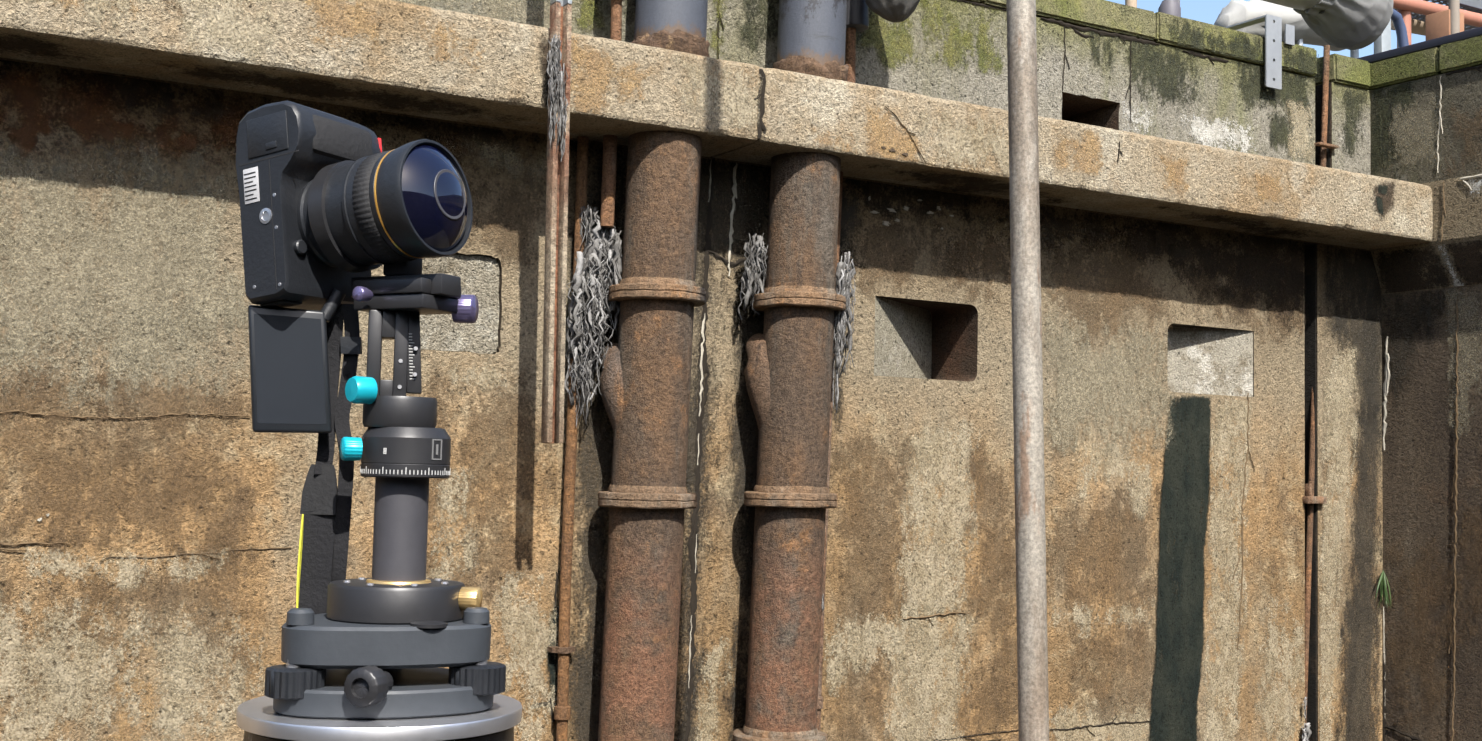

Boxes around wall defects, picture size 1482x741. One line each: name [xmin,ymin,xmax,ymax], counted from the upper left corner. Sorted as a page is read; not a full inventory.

crack [754,69,767,139]
damp [1122,101,1150,135]
damp [1182,115,1257,153]
damp [1287,102,1314,159]
damp [1043,245,1482,741]
crack [0,542,70,551]
crack [105,547,292,559]